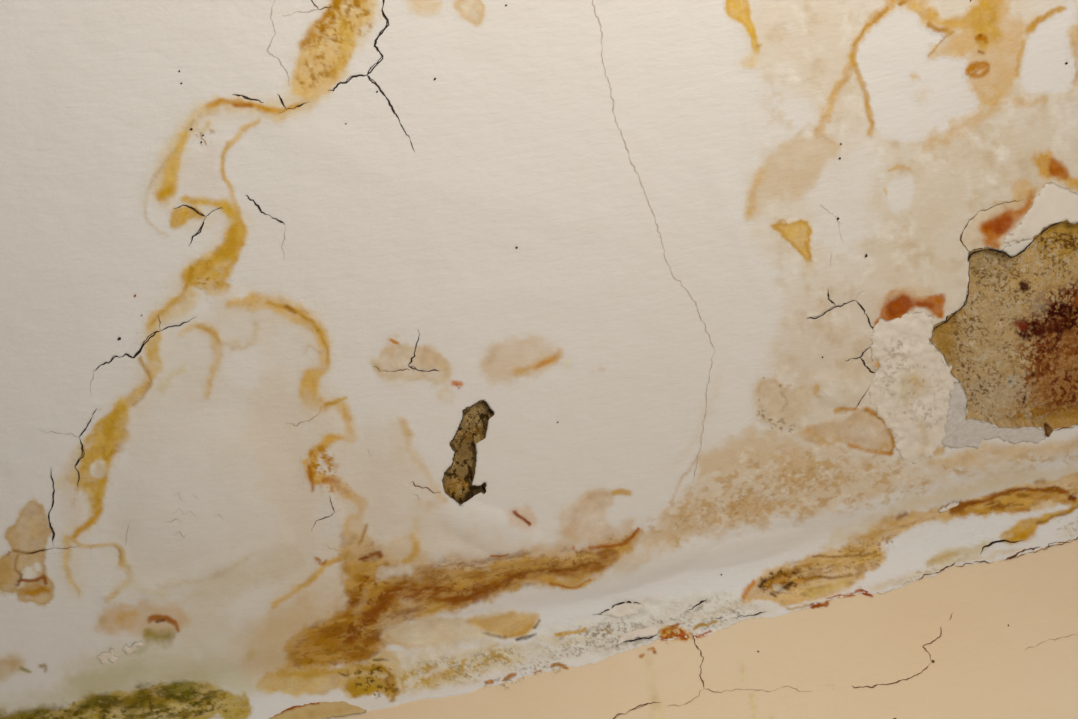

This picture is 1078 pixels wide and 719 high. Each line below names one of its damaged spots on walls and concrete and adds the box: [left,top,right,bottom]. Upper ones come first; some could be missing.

crack [232,0,414,150]
rust [957,146,1078,252]
damp [0,0,659,719]
damp [642,0,1078,609]
rust [871,281,948,327]
spalling [869,182,1078,464]
crack [26,315,197,554]
spalling [443,400,494,506]
spalling [864,545,1029,595]
spalling [1048,511,1078,547]
crack [613,599,811,719]
crack [853,614,952,688]